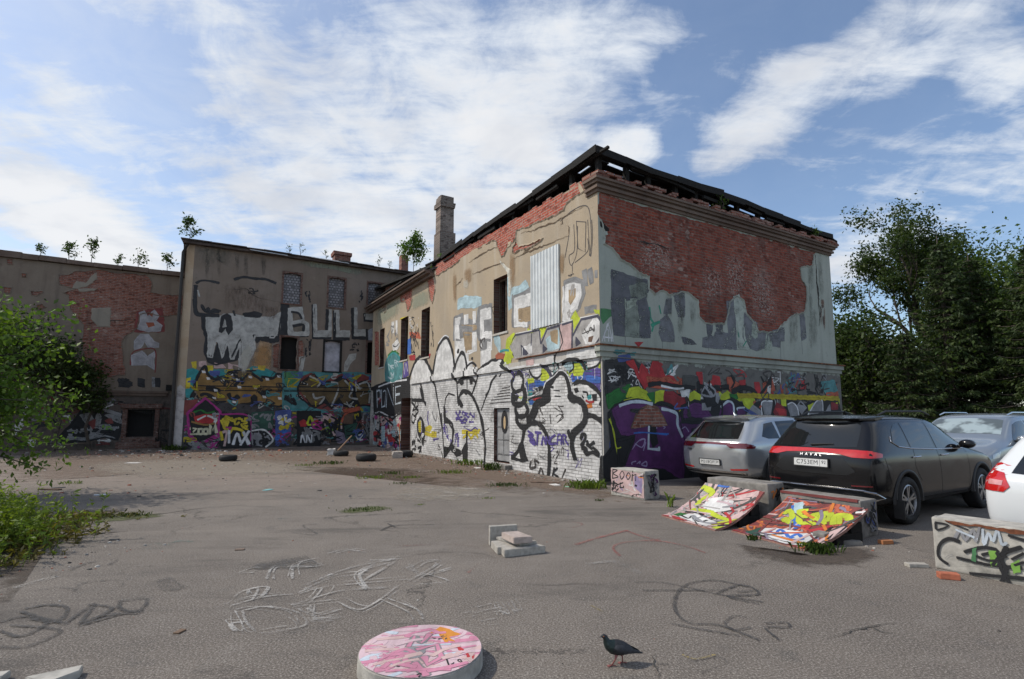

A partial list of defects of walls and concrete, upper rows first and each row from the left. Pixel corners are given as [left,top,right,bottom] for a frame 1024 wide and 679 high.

flaking render [58,269,183,379]
flaking render [427,182,585,305]
flaking render [597,193,815,334]